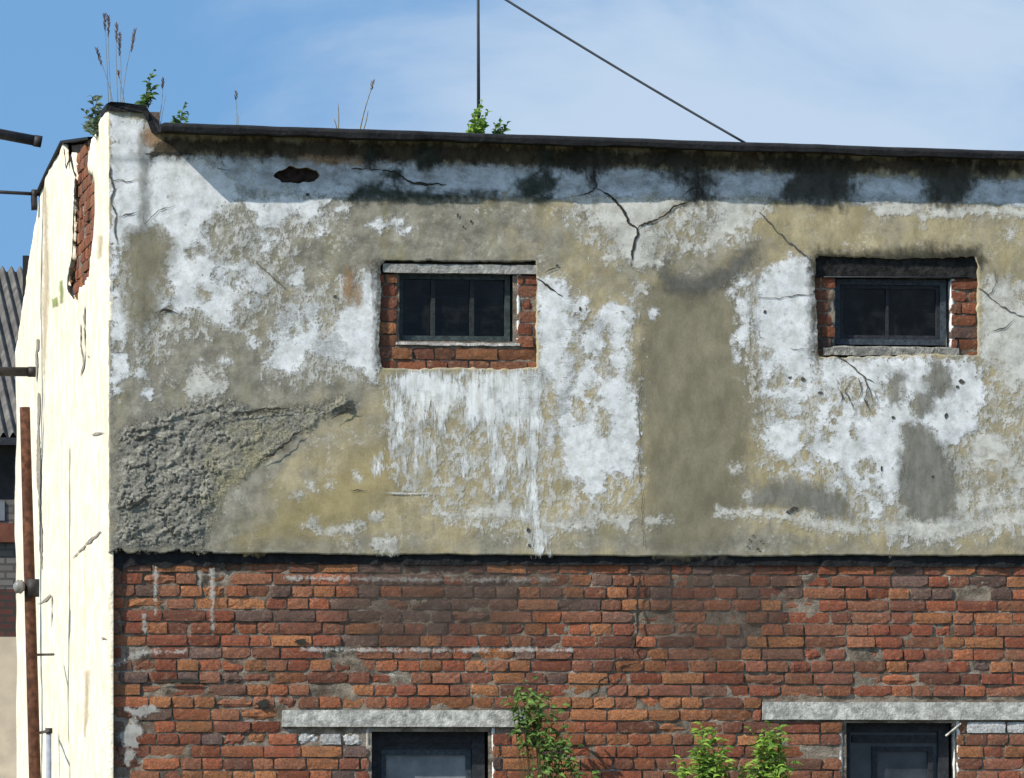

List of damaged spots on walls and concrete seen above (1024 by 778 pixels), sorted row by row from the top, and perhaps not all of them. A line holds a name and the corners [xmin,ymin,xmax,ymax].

flaking render [63,136,95,300]
crack [352,144,446,186]
water stain [150,135,1024,210]
crack [582,157,707,266]
crack [759,212,809,259]
peeling [839,172,1024,240]
peeling [109,113,825,556]
crack [978,273,1024,331]
water stain [113,245,1024,632]
crack [790,348,883,410]
peeling [714,251,1024,552]